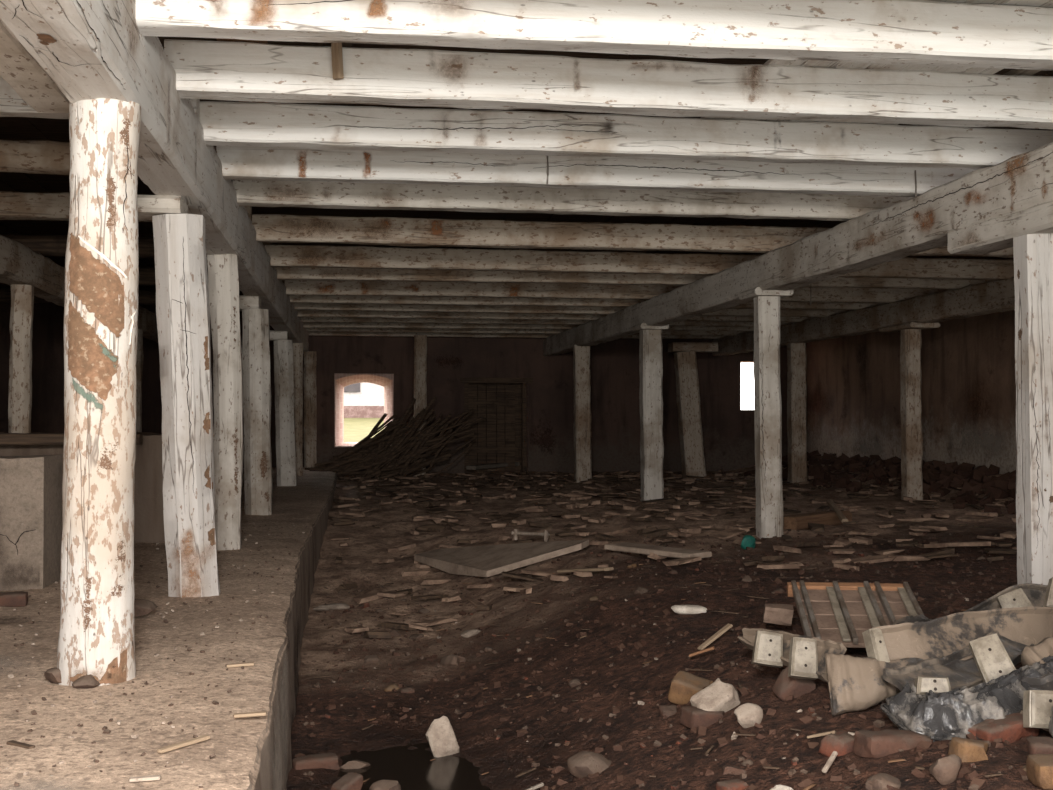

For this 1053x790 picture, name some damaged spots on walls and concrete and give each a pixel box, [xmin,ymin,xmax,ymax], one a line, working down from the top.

peeling [67,233,136,410]
peeling [97,443,117,470]
peeling [82,576,93,632]
peeling [70,649,127,684]